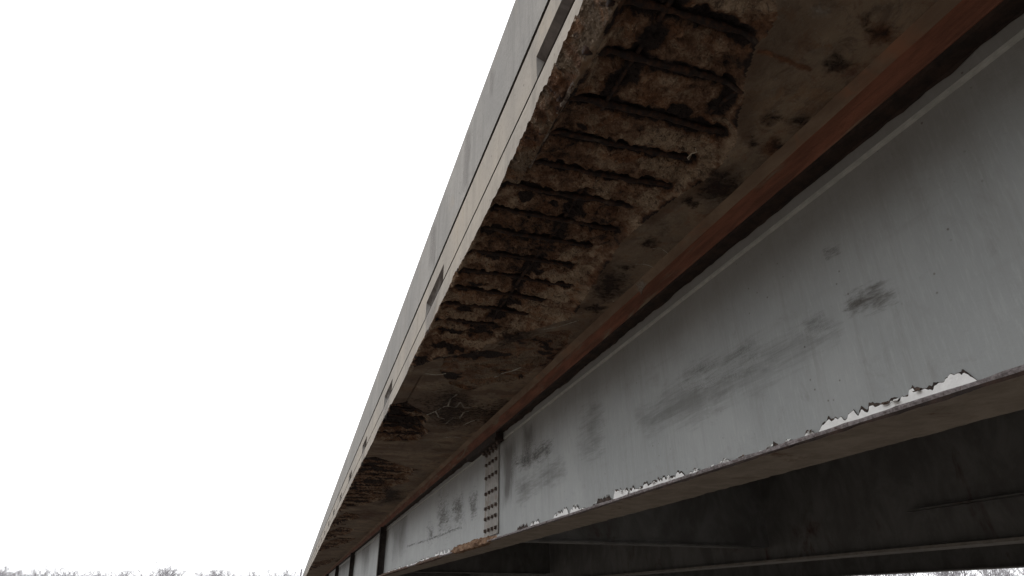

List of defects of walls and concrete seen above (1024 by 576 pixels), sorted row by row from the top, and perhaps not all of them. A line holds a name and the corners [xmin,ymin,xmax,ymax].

spalling [410,0,779,390]
spalling [374,401,430,441]
peeling [805,369,977,436]
spalling [309,457,418,570]